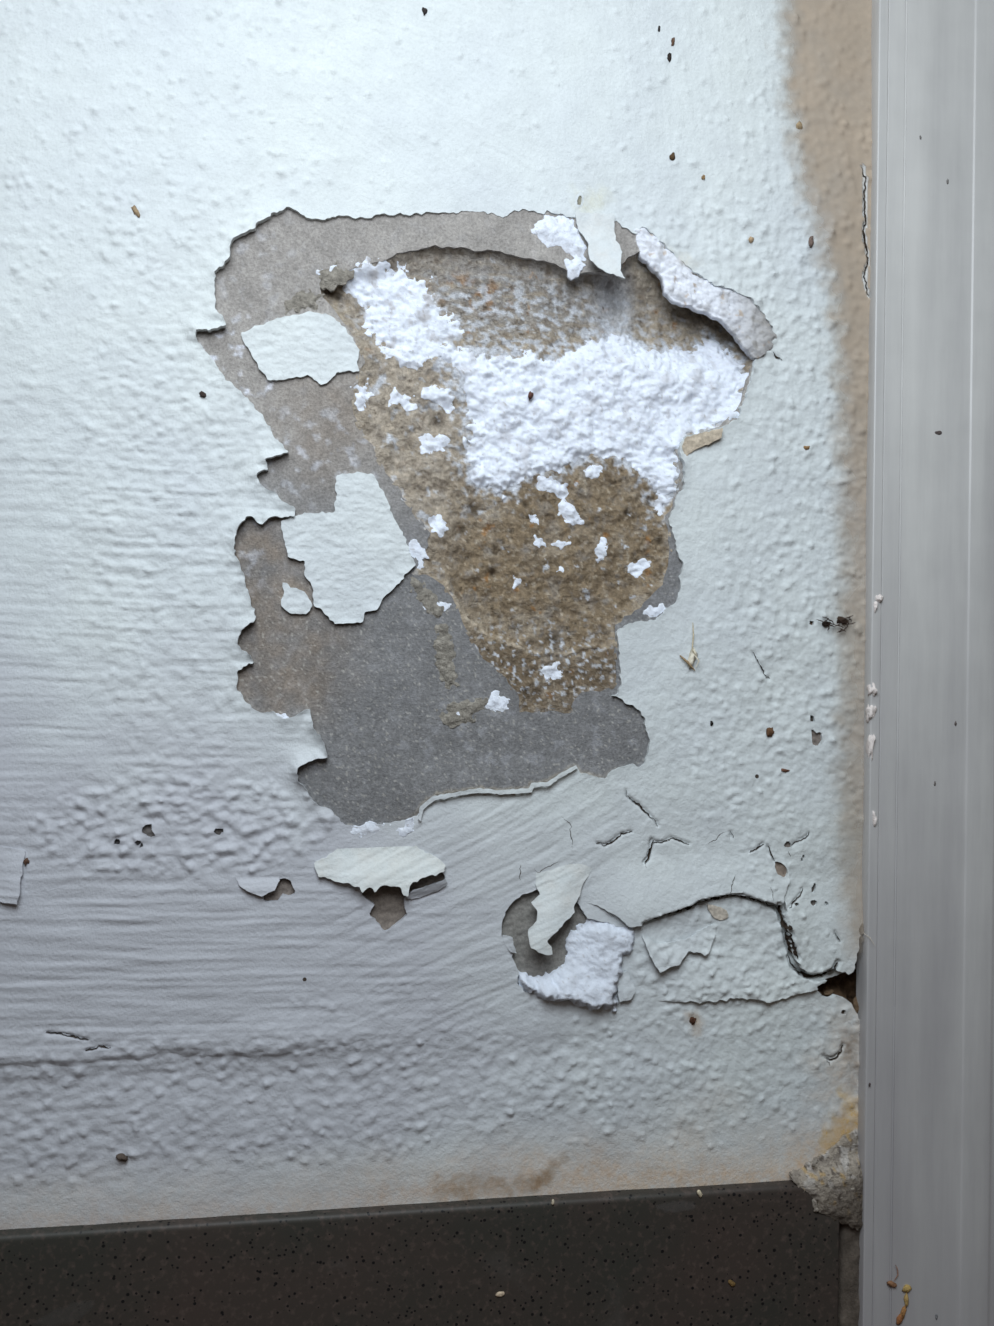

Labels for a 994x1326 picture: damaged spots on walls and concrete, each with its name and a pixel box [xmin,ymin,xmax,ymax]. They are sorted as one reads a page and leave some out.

water stain [784,0,872,574]
flaking render [196,197,777,930]
peeling [501,863,728,1012]
crack [519,790,841,978]
peeling [775,862,786,877]
flaking render [817,960,859,1014]
spalling [789,1128,863,1231]